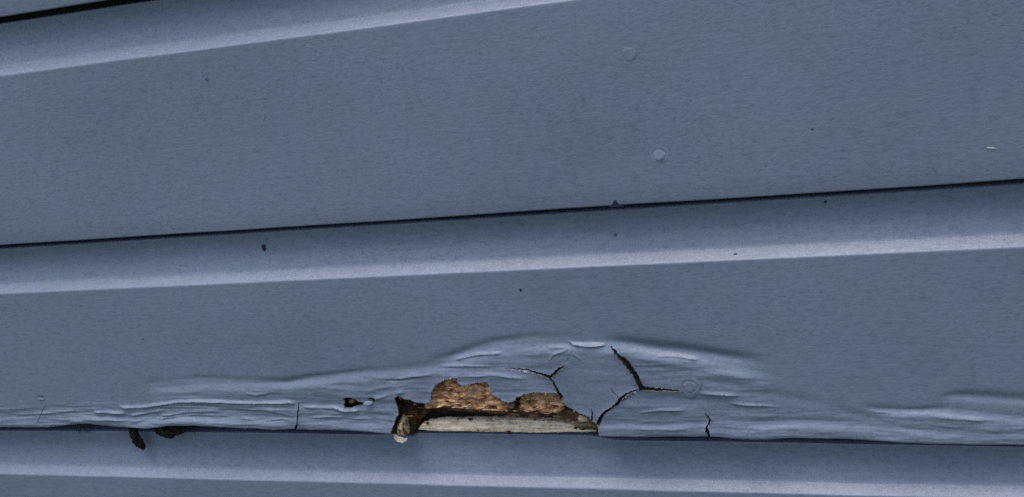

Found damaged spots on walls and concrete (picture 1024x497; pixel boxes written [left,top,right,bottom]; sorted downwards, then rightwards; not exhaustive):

spalling [344,397,375,408]
crack [518,365,564,398]
crack [591,348,680,424]
spalling [392,410,503,444]